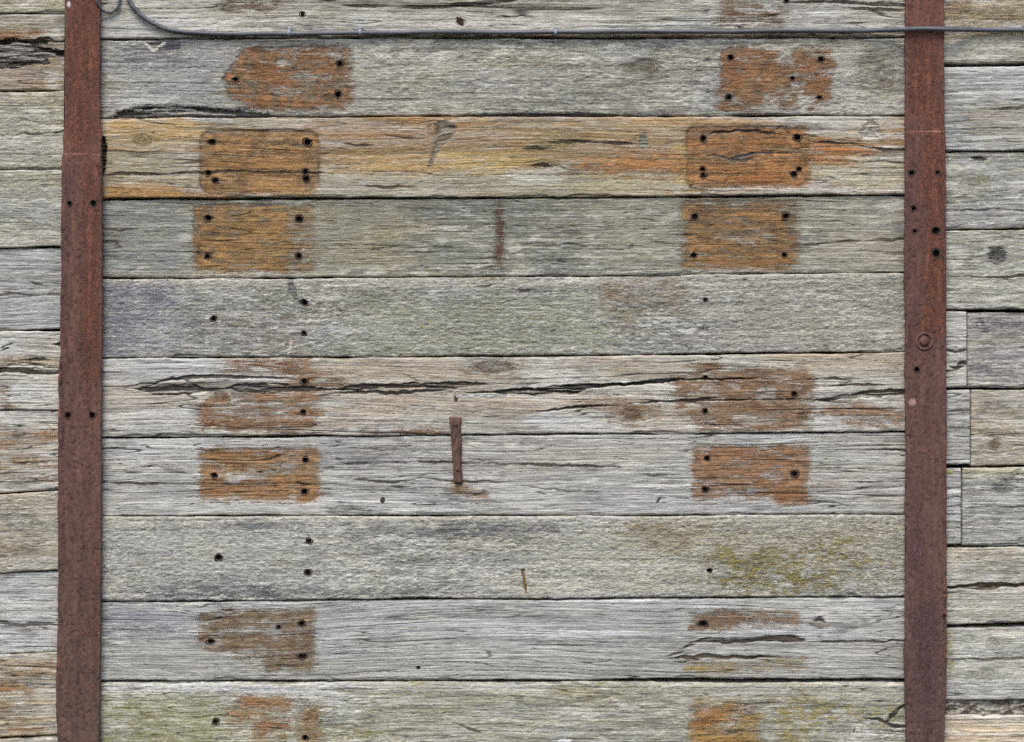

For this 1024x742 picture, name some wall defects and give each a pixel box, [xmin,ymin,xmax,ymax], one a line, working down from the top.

rust [65,0,102,152]
rust [224,43,355,112]
rust [79,160,186,382]
rust [192,129,321,275]
rust [572,45,874,272]
rust [906,36,946,339]
rust [0,362,66,482]
rust [198,446,322,503]
crack [137,375,743,412]
rust [670,360,905,505]
crack [777,377,905,401]
crack [668,635,904,663]